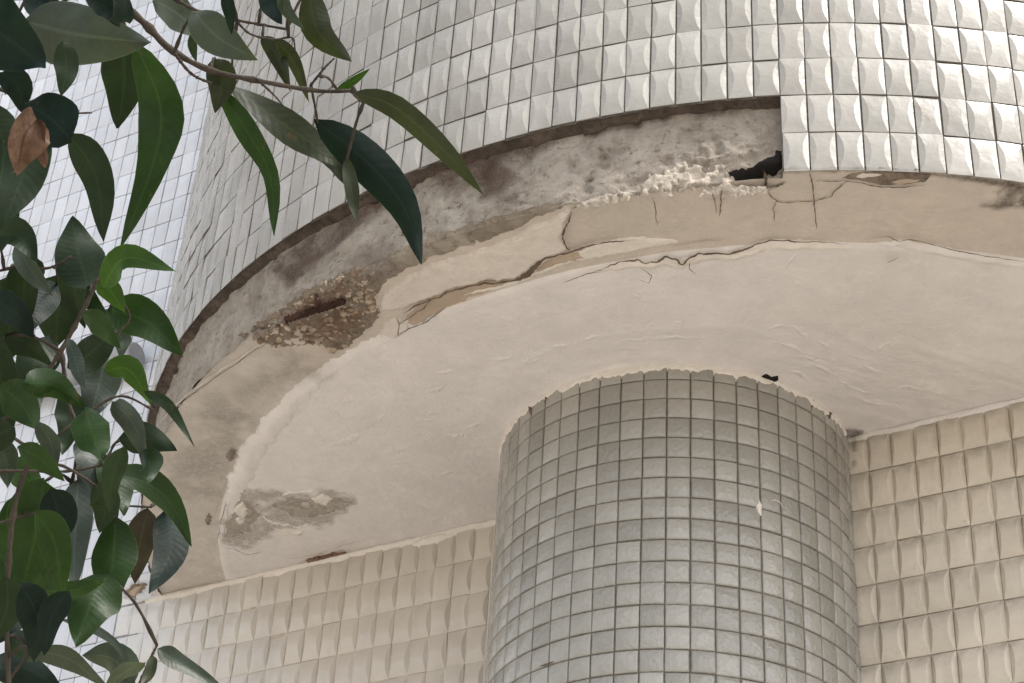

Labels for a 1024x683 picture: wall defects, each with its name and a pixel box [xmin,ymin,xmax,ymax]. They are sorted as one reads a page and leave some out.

crack [763,172,846,228]
flaking render [843,168,931,188]
spalling [148,97,853,434]
crack [396,206,630,335]
crack [865,236,1024,268]
peeling [220,490,352,555]